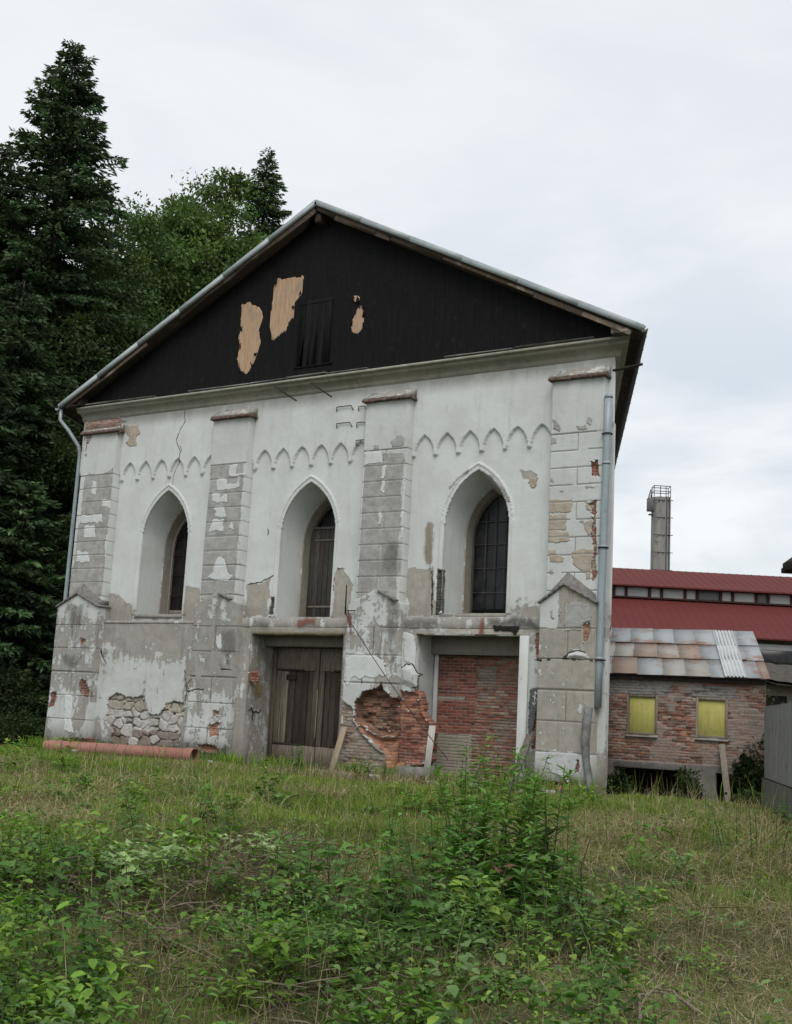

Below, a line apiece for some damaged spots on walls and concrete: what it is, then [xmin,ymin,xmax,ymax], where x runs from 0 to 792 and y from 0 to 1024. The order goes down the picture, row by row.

peeling [236,275,304,374]
peeling [351,296,365,334]
flaking render [84,417,141,455]
peeling [69,468,113,597]
peeling [201,463,246,600]
peeling [528,459,599,582]
spalling [79,679,92,698]
spalling [106,694,185,746]
flaking render [351,682,439,770]